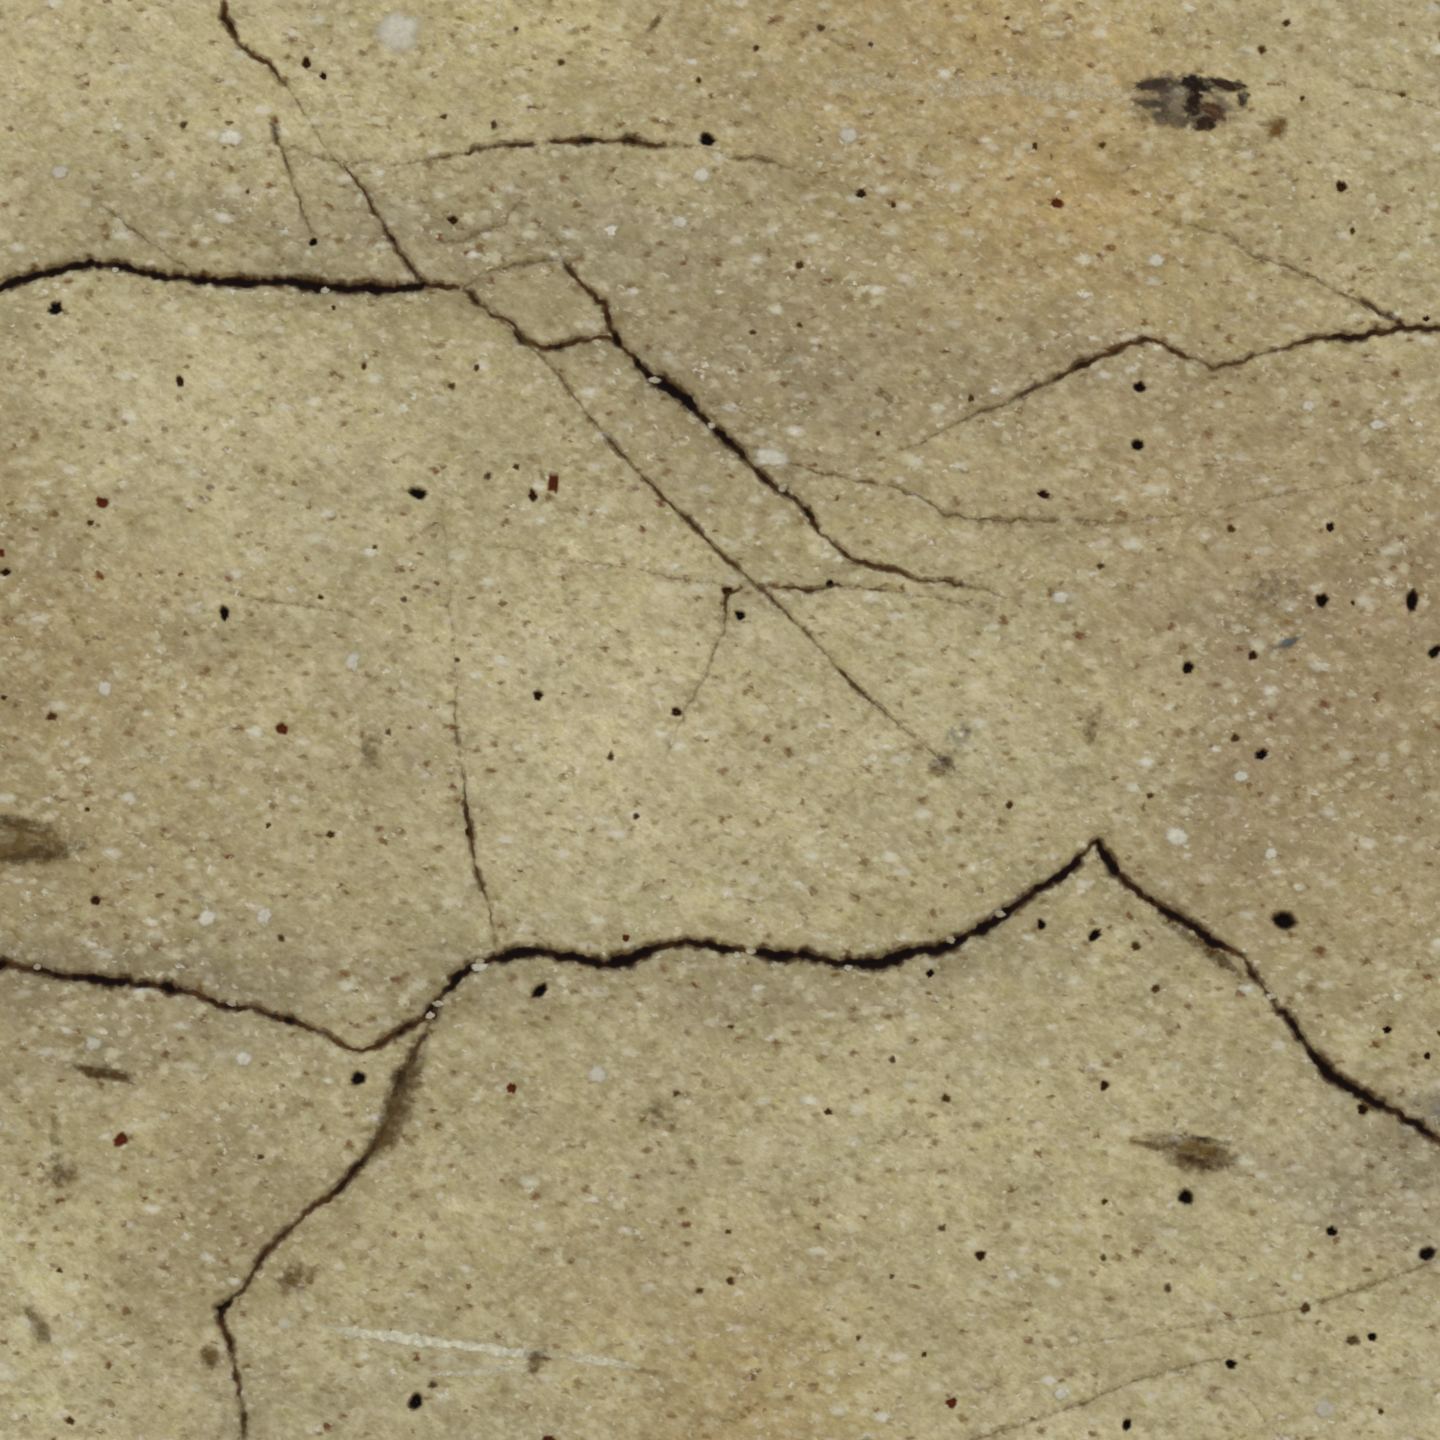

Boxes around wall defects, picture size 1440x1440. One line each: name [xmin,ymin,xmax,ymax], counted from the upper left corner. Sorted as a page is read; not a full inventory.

crack [220,0,297,100]
crack [273,126,306,218]
crack [433,135,676,159]
crack [964,231,1440,420]
crack [0,159,1052,655]
crack [838,668,887,715]
crack [0,704,1440,1439]